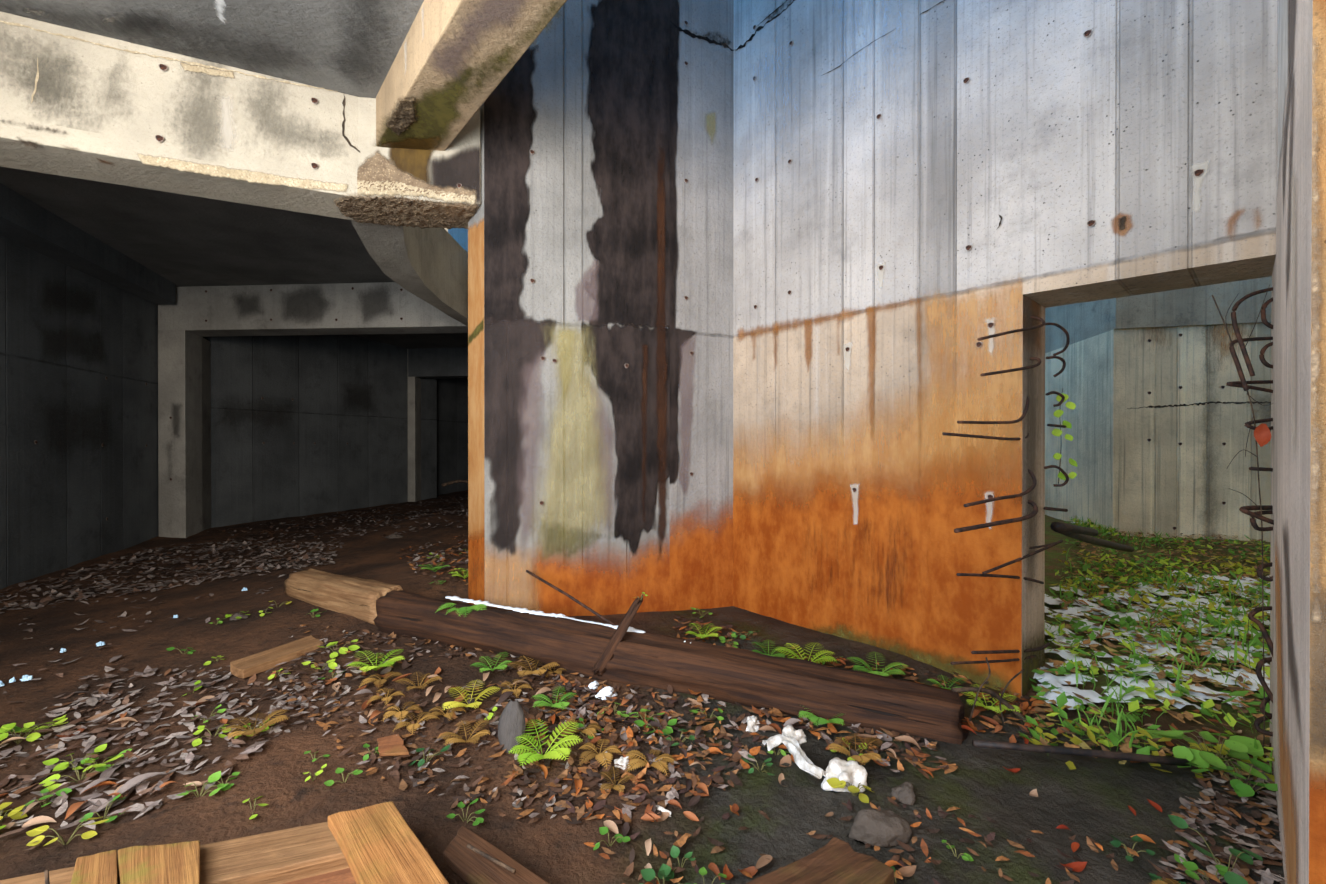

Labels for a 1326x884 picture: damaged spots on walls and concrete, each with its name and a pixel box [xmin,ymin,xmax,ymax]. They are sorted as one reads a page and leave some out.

leakage [216,0,225,22]
crack [670,0,794,51]
crack [342,96,360,152]
spalling [137,151,478,229]
leakage [390,0,695,554]
spalling [977,316,1070,407]
spalling [1226,287,1273,393]
corrosion [468,156,1045,698]
spalling [942,397,1029,441]
spalling [954,465,1069,533]
spalling [1239,505,1274,531]
corrosion [1275,556,1326,884]